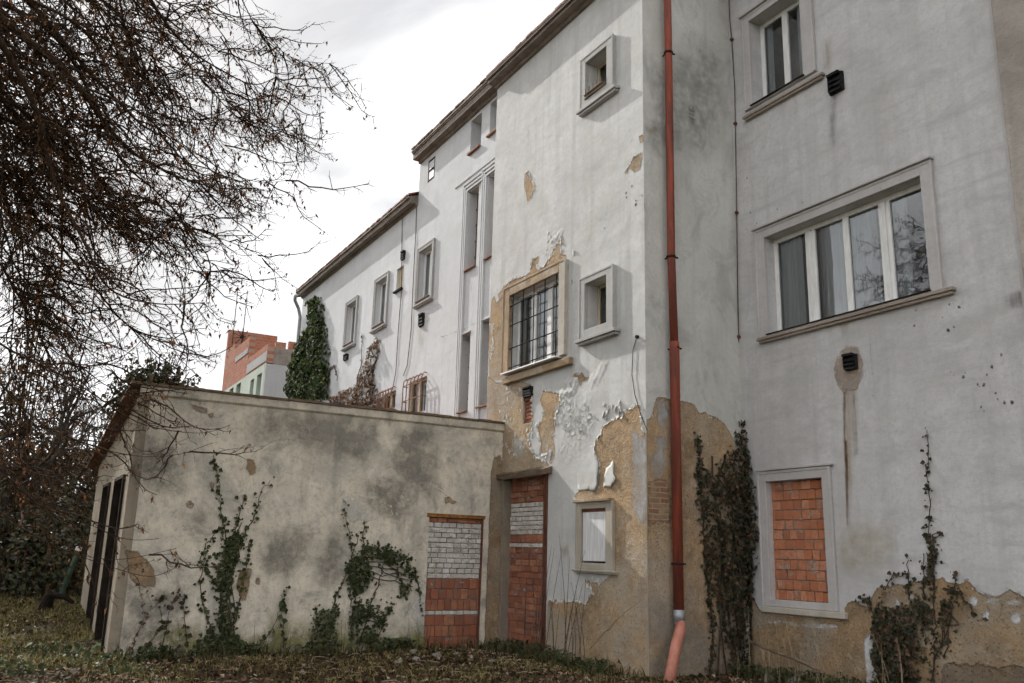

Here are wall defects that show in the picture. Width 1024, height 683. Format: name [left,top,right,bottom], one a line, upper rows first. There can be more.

spalling [624,135,643,174]
spalling [524,171,535,202]
flaking render [571,371,589,386]
leakage [270,414,376,456]
flaking render [484,231,566,645]
spalling [246,459,256,475]
flaking render [545,397,1024,683]
spalling [126,550,155,587]
spalling [236,569,260,600]